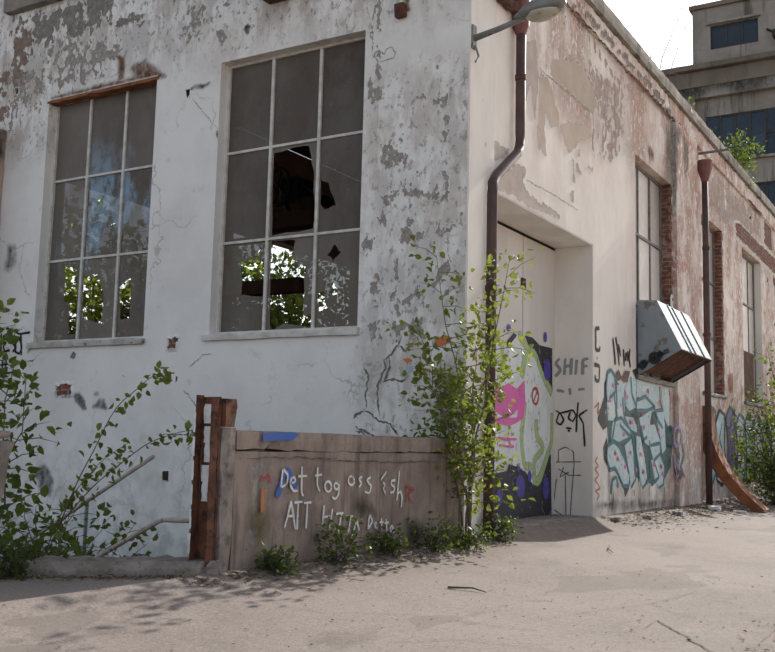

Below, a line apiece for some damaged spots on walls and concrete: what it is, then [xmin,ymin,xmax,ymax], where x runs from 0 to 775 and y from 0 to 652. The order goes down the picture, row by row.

flaking render [0,0,146,136]
flaking render [180,0,208,47]
flaking render [216,29,228,47]
flaking render [367,0,383,105]
spalling [497,0,519,13]
flaking render [525,2,676,203]
flaking render [361,235,375,257]
flaking render [376,84,451,245]
flaking render [498,163,560,219]
flaking render [708,174,775,284]
flaking render [367,257,451,344]
crack [353,336,413,436]